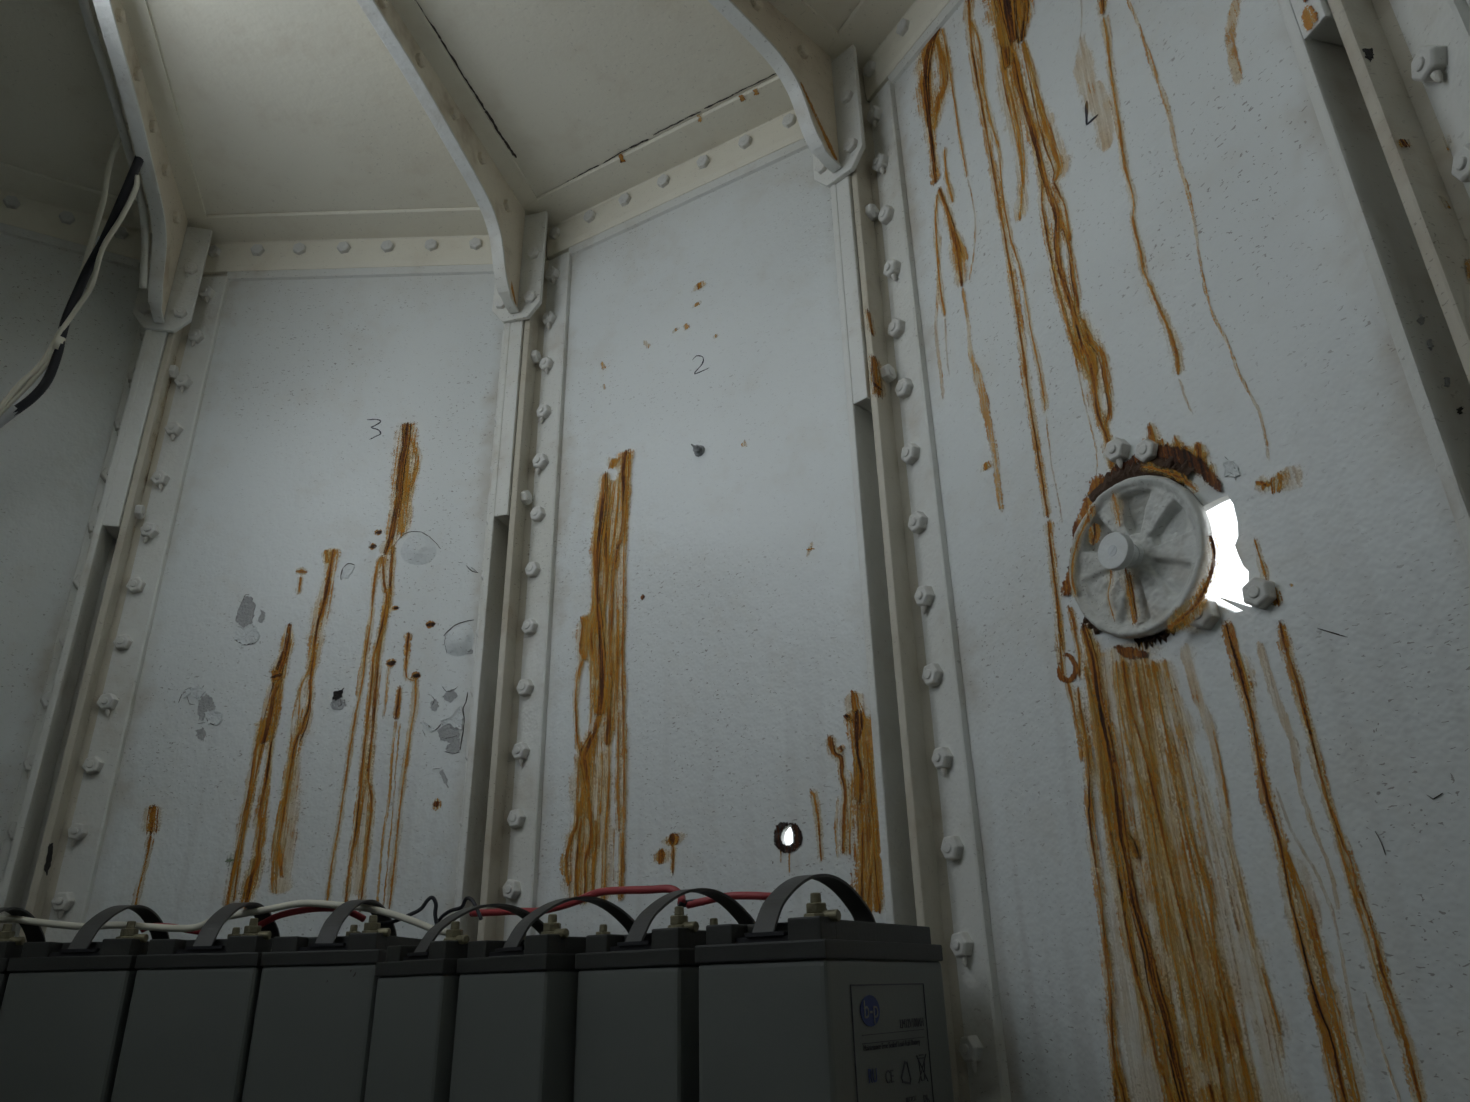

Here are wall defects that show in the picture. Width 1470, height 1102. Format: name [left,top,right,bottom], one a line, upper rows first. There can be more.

rust [1301,0,1318,31]
rust [132,805,159,905]
rust [225,549,341,908]
rust [326,422,419,912]
rust [559,449,633,905]
rust [810,690,885,914]
rust [913,0,1259,1102]
rust [1256,471,1283,494]
rust [1221,621,1360,1102]
rust [1254,539,1422,1102]